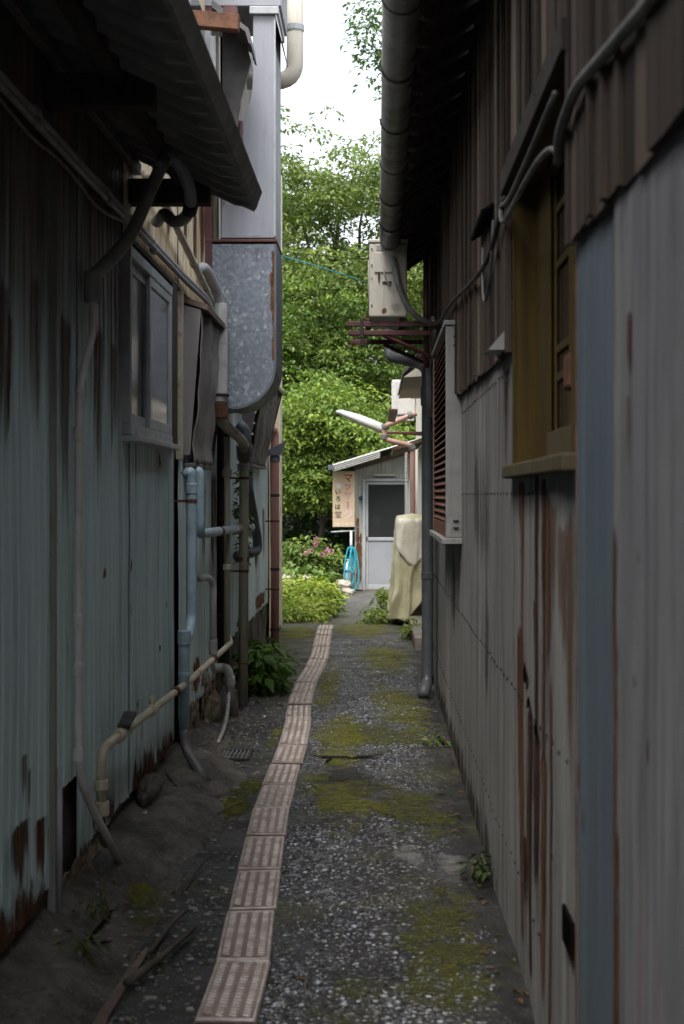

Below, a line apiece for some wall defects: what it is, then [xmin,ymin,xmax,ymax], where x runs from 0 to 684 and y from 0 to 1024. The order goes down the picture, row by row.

corrosion [0,816,49,951]